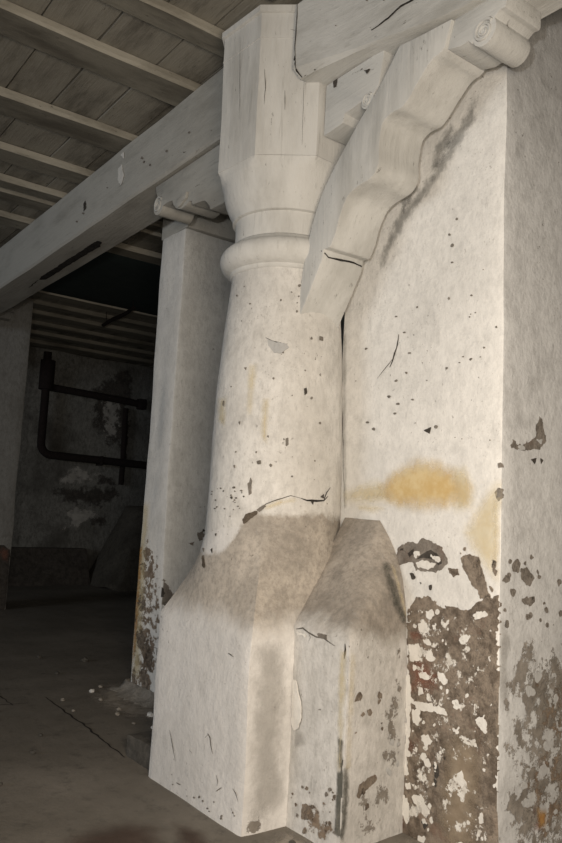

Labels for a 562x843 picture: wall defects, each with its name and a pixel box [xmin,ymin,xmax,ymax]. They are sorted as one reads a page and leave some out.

crack [371,0,413,30]
crack [321,251,362,267]
leakage [93,371,133,458]
flaking render [511,416,546,464]
leakage [358,466,468,504]
flaking render [189,529,212,568]
flaking render [161,579,174,606]
leakage [384,565,405,622]
peeling [132,629,158,690]
flaking render [357,538,562,843]
peeling [291,788,336,840]